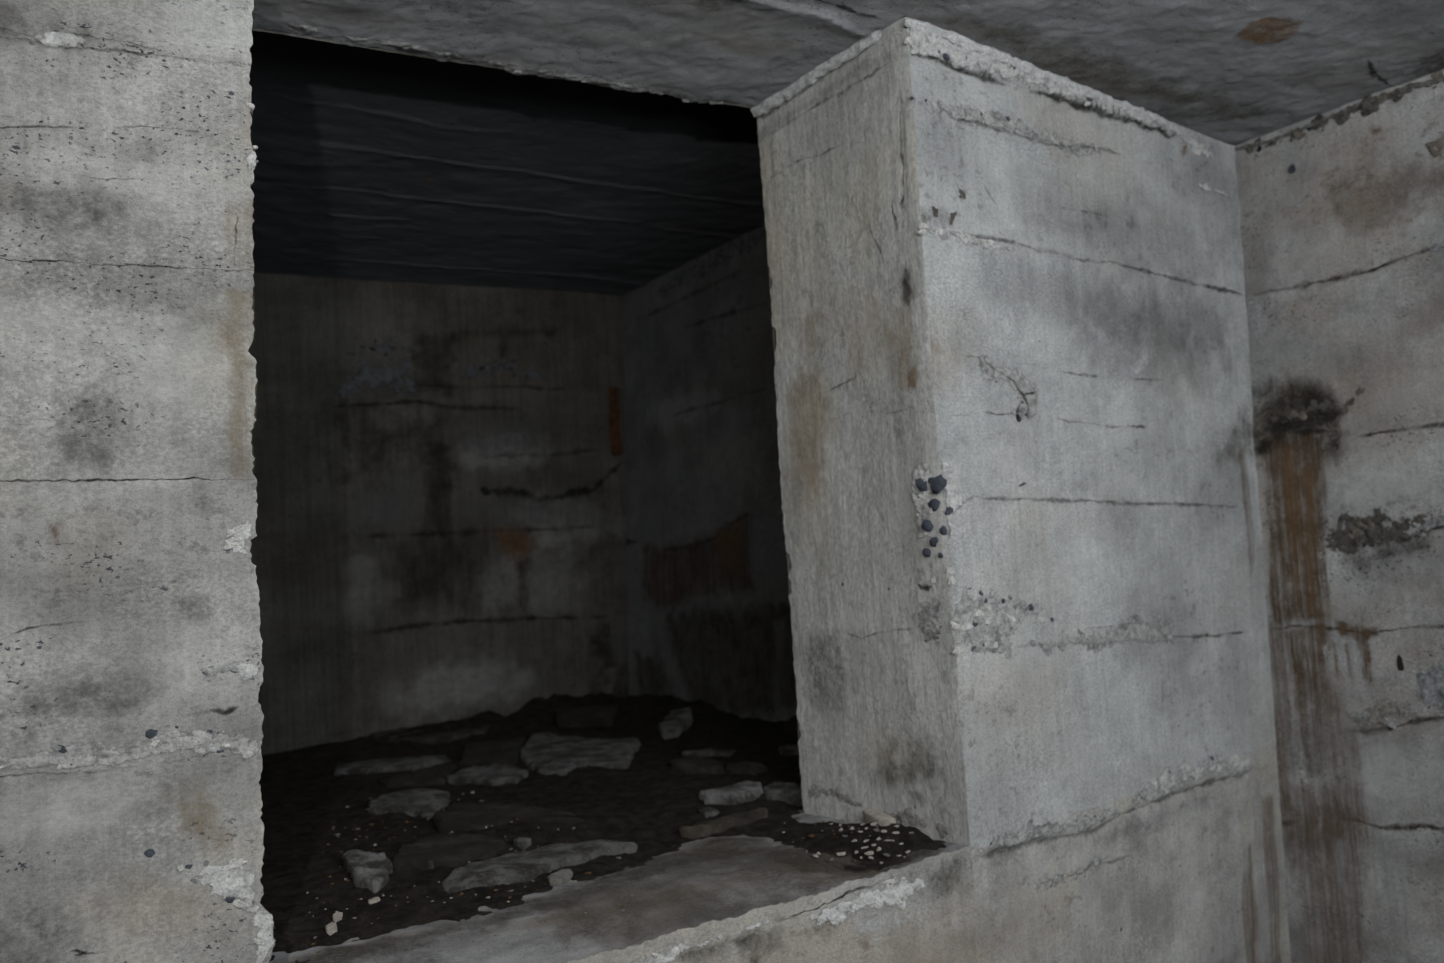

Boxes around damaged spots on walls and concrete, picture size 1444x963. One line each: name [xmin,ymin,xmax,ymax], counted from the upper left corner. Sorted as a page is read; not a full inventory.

crack [1294,249,1430,288]
crack [1,475,223,483]
spalling [1325,507,1428,554]
spalling [911,461,1175,659]
rust [1253,381,1377,846]
crack [1344,818,1443,830]
spalling [806,873,926,926]
spalling [632,919,770,963]